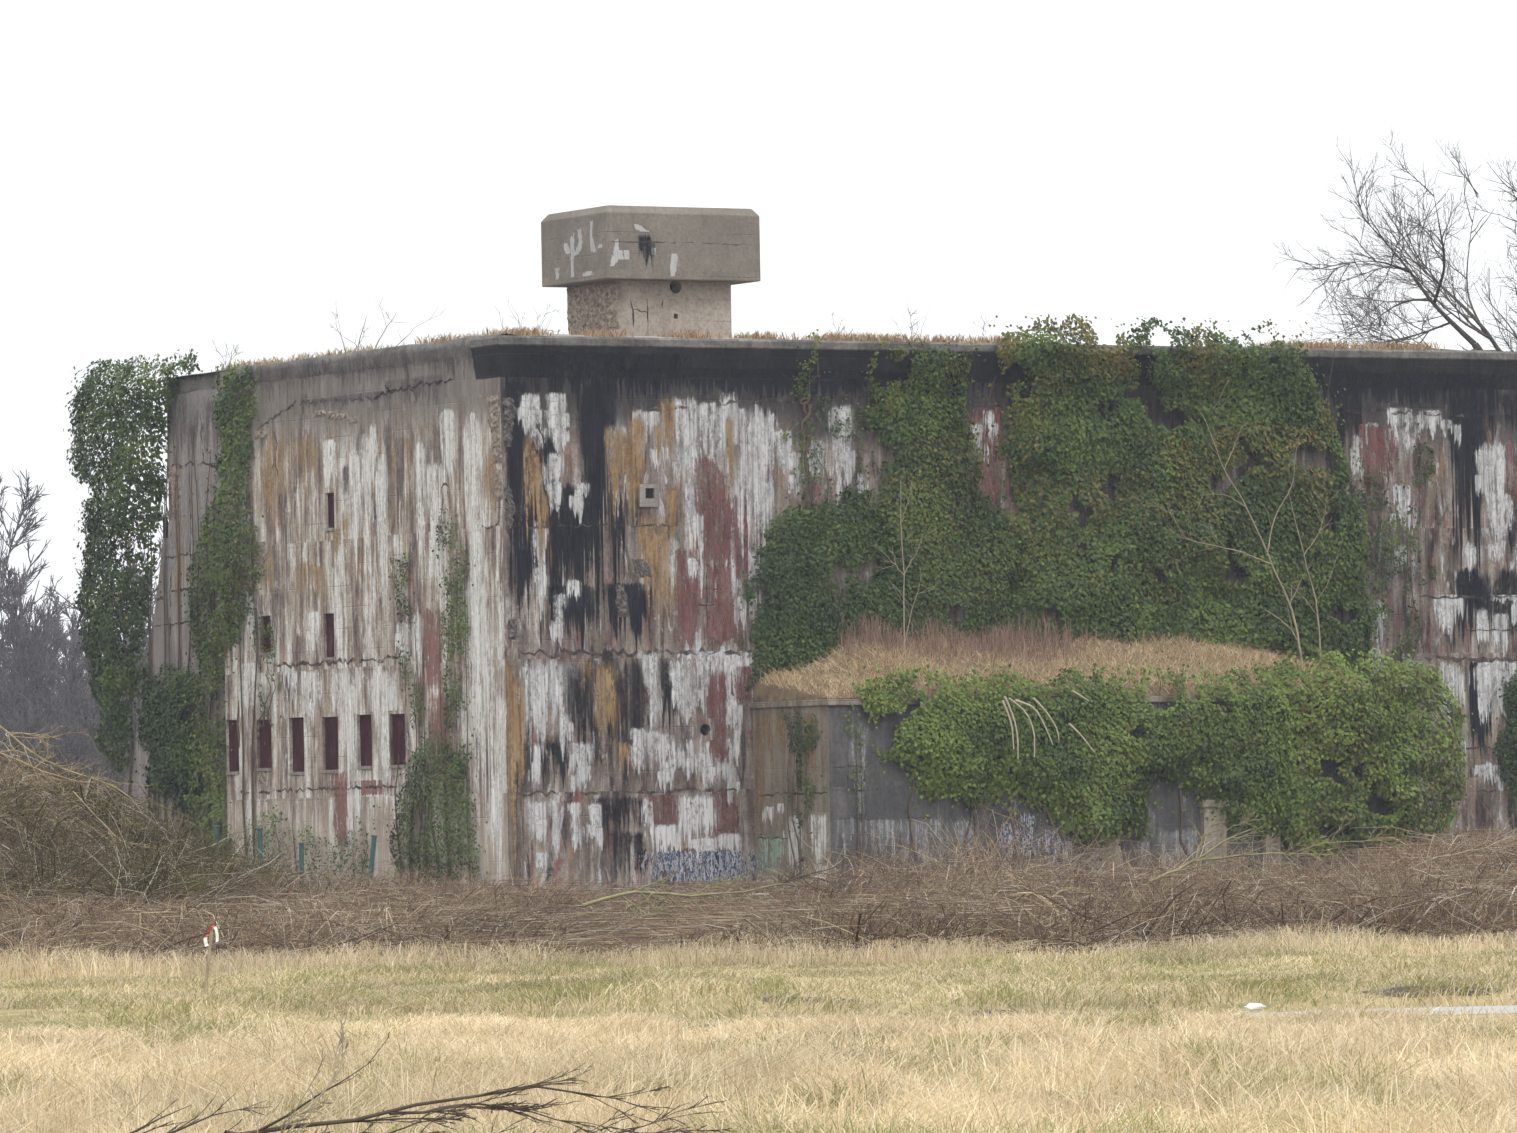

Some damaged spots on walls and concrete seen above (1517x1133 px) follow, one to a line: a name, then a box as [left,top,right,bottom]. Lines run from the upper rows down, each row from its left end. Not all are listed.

spalling [487,395,518,529]
peeling [1359,423,1396,495]
peeling [1505,442,1517,503]
spalling [507,619,519,640]
leakage [239,344,1019,883]
spalling [615,559,652,617]
peeling [672,458,750,648]